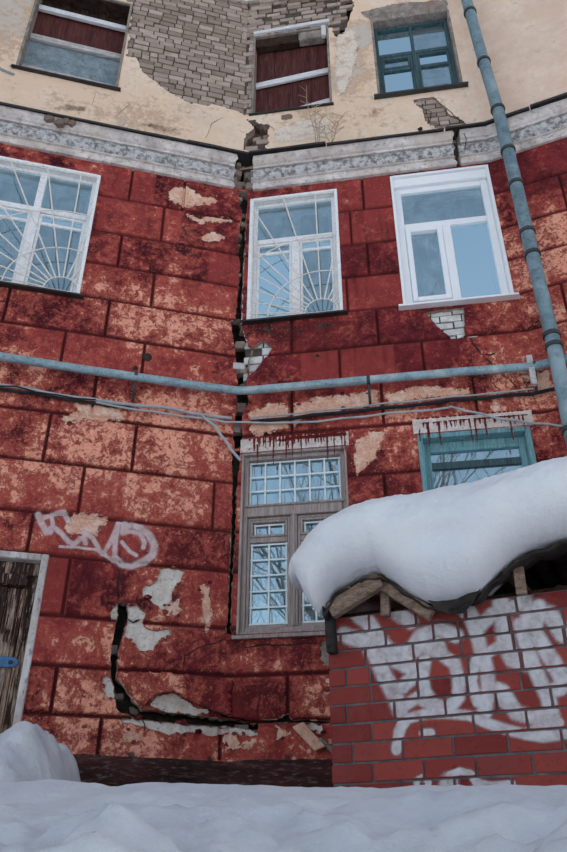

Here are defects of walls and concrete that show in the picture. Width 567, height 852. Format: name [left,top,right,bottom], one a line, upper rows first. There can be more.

flaking render [126,0,448,151]
flaking render [414,97,465,131]
peeling [167,186,232,242]
flaking render [426,308,478,339]
flaking render [243,340,272,384]
crack [183,191,320,667]
peeling [248,383,470,437]
peeling [353,429,385,476]
flaking render [143,566,184,616]
flaking render [110,602,171,652]
crack [103,549,330,733]
flaking render [120,693,258,755]